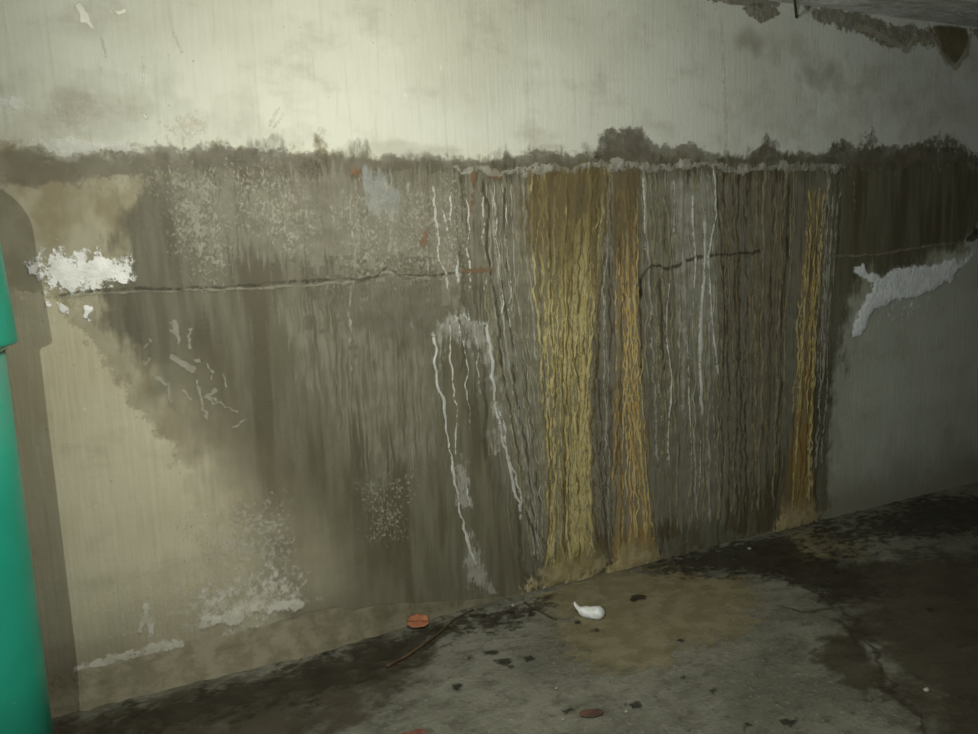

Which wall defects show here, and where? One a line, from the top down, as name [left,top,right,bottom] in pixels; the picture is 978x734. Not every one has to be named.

peeling [75,2,107,57]
spalling [712,0,780,146]
spalling [803,5,949,65]
crack [60,268,452,297]
water stain [0,128,978,672]
rust [521,163,663,594]
rust [773,189,829,532]
water stain [54,616,475,734]
water stain [816,552,978,734]